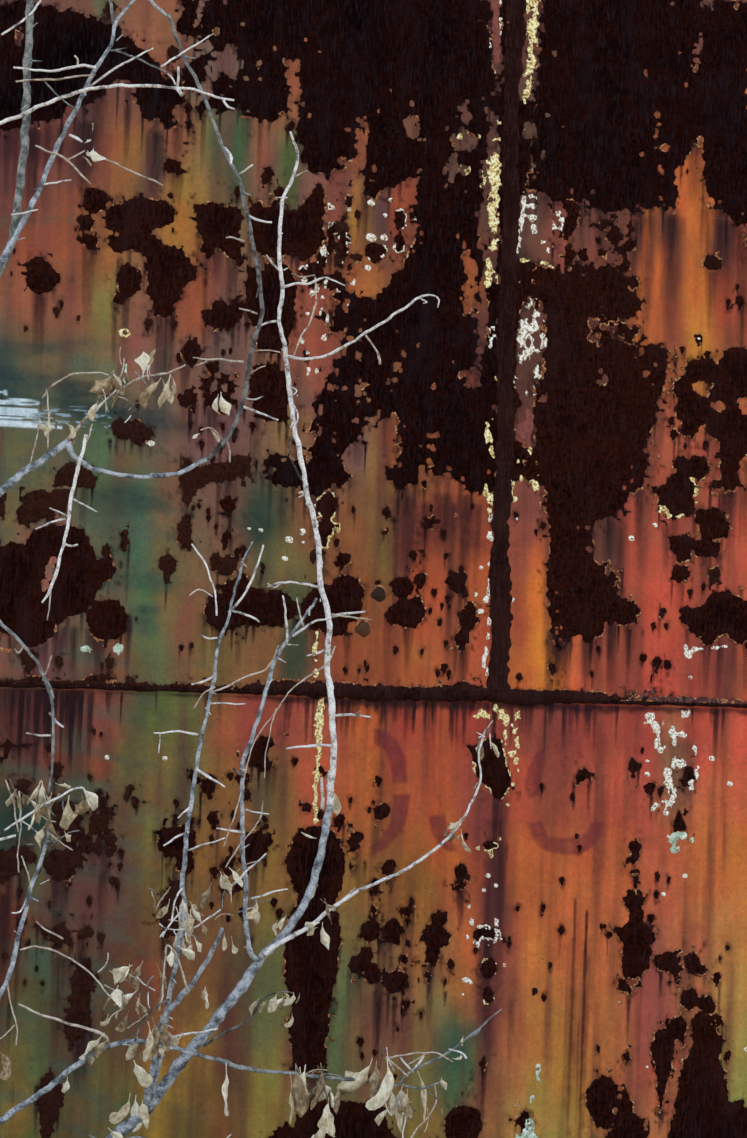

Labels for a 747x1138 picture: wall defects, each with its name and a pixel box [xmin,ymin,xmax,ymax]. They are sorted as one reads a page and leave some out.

corrosion [0,0,747,858]
peeling [652,505,684,527]
peeling [684,644,727,659]
corrosion [0,774,146,1054]
corrosion [153,734,470,1074]
corrosion [473,924,512,1005]
corrosion [583,836,747,1138]
corrosion [35,1068,65,1138]
corrosion [269,1098,398,1138]
corrosion [443,1105,483,1138]
corrosion [509,1110,534,1133]